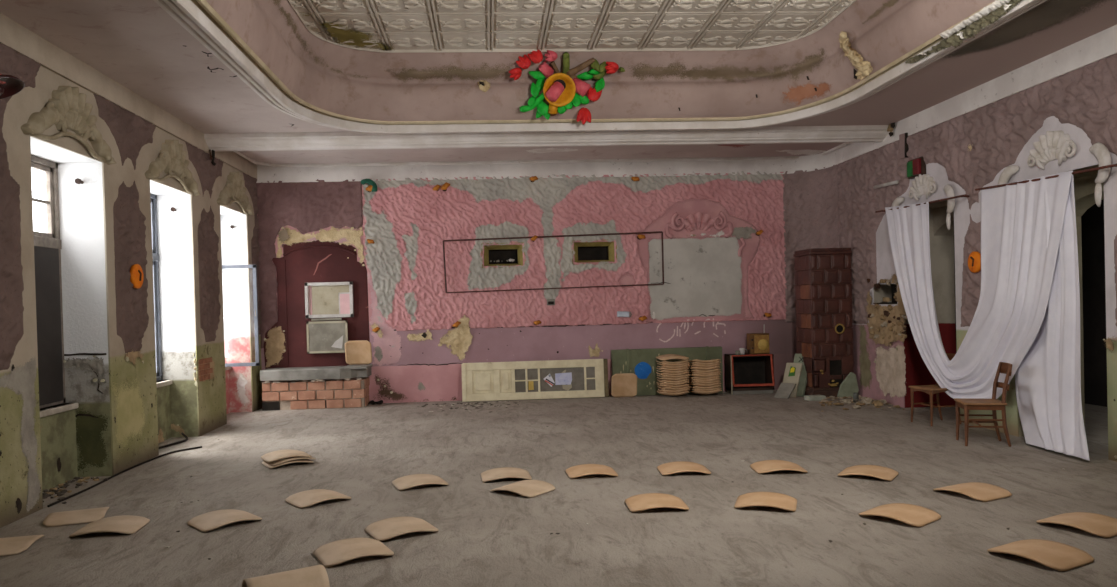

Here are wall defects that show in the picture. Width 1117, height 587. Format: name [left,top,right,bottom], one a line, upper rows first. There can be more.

leakage [627,49,830,86]
peeling [275,171,783,367]
flaking render [865,274,908,398]